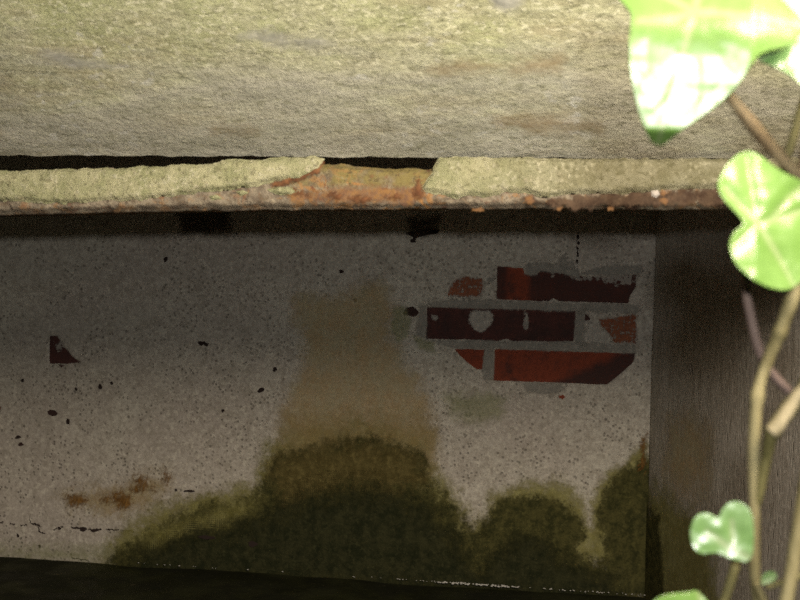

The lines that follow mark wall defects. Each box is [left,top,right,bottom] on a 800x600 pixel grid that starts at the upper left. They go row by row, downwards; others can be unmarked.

rust [523,189,725,211]
flaking render [403,263,642,399]
flaking render [49,336,80,367]
water stain [285,288,432,474]
rust [61,494,88,508]
rust [99,477,155,510]
crack [0,518,134,548]
water stain [399,579,519,588]